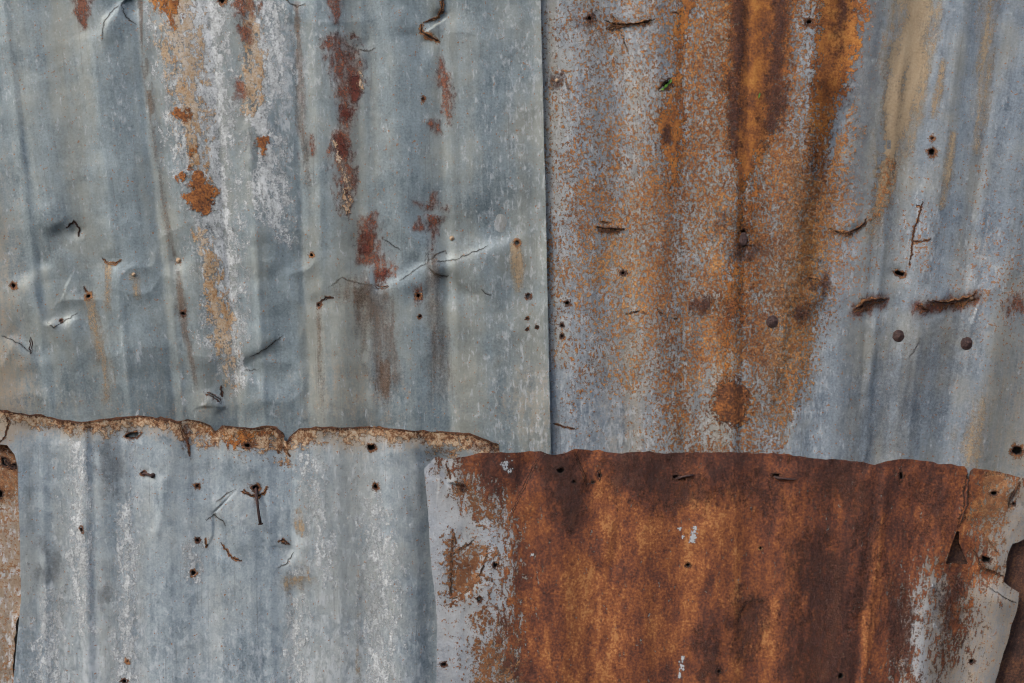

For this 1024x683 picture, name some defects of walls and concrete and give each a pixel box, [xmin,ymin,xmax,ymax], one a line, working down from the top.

corrosion [428,58,454,133]
corrosion [310,0,397,394]
corrosion [849,295,888,316]
corrosion [911,294,980,316]
corrosion [0,444,18,510]
corrosion [435,525,496,612]
corrosion [467,605,490,638]